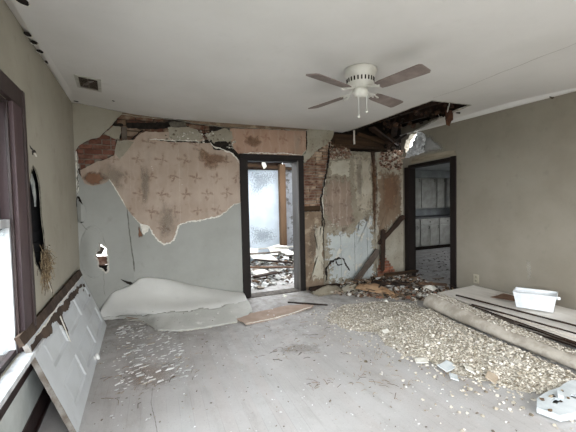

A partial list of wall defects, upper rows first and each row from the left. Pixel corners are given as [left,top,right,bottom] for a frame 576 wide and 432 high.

spalling [29,165,46,272]
peeling [30,284,85,352]
peeling [75,114,405,284]
crack [320,142,335,242]
crack [325,257,350,280]